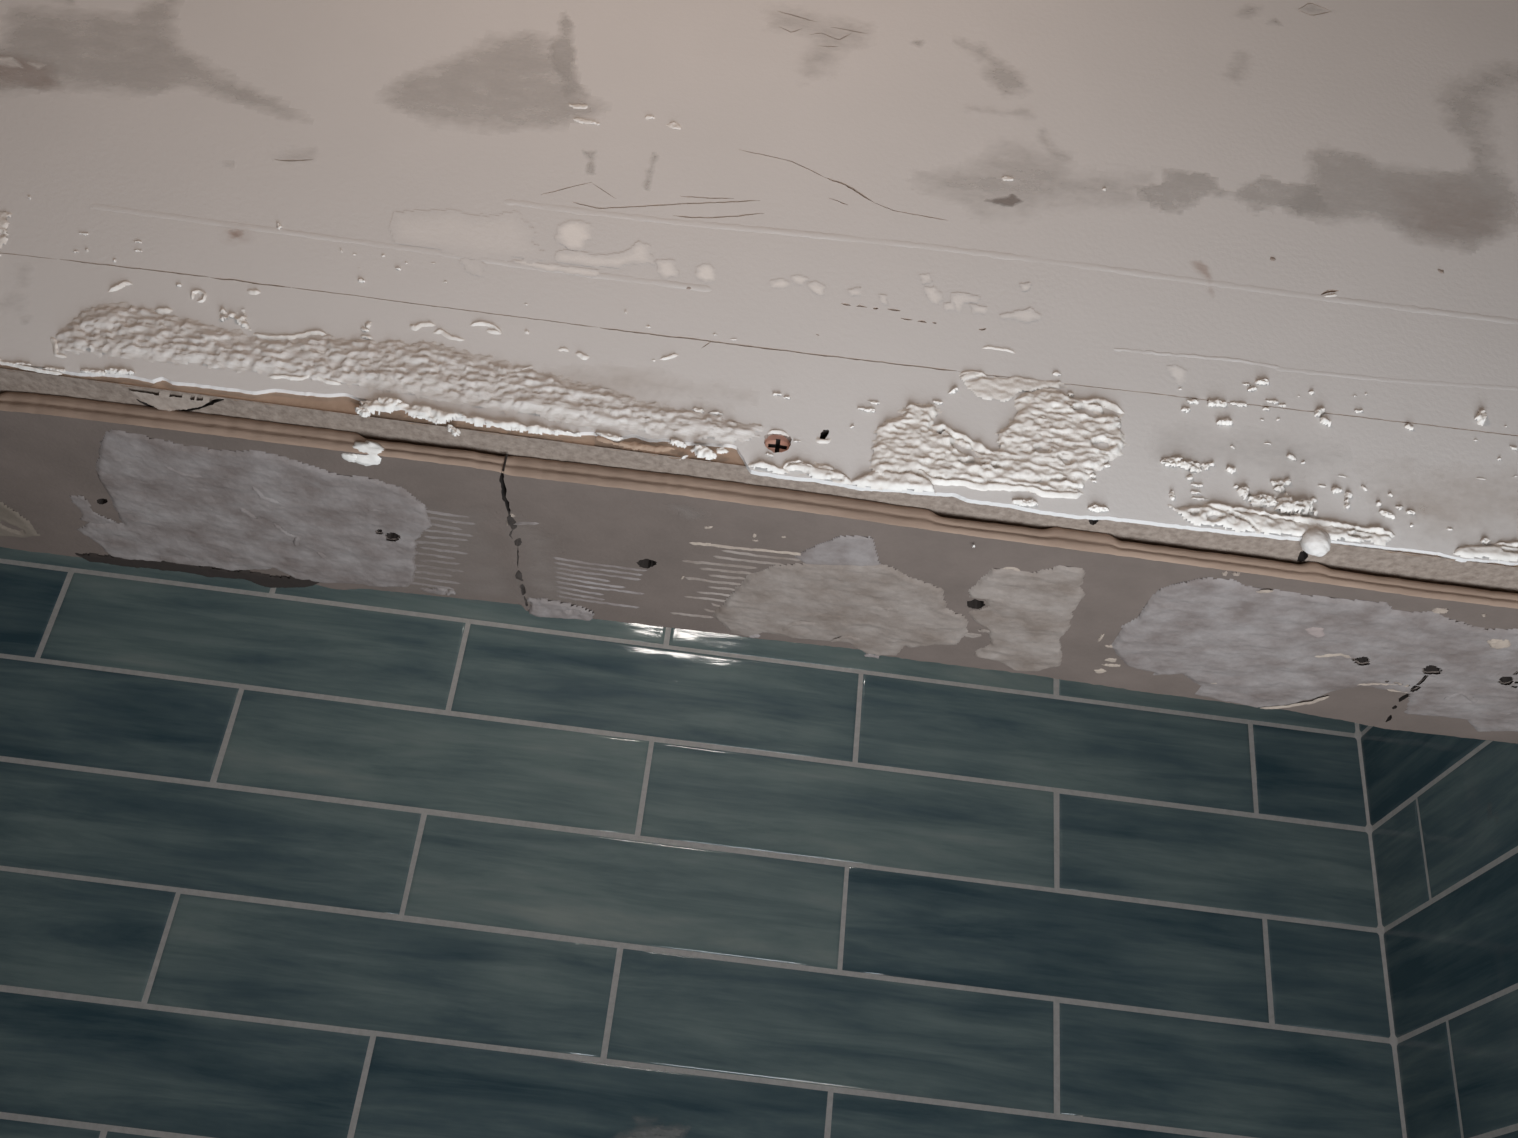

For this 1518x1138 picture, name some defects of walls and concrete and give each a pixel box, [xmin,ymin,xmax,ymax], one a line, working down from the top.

spalling [0,212,12,256]
spalling [354,397,729,460]
spalling [748,370,1130,525]
crack [499,454,528,608]